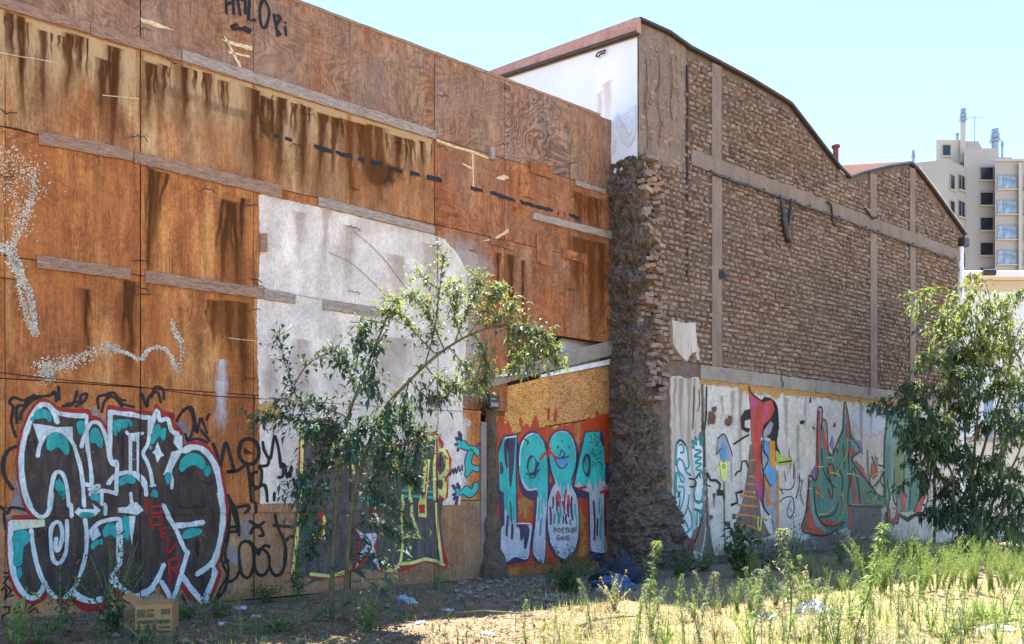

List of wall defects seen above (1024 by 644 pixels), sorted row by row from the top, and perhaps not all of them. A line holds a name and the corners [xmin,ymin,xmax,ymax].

damp [3,11,119,119]
damp [146,61,229,107]
damp [246,87,432,176]
damp [146,168,169,248]
damp [218,197,248,262]
damp [496,252,525,321]
damp [572,236,605,302]
peeling [667,320,700,362]